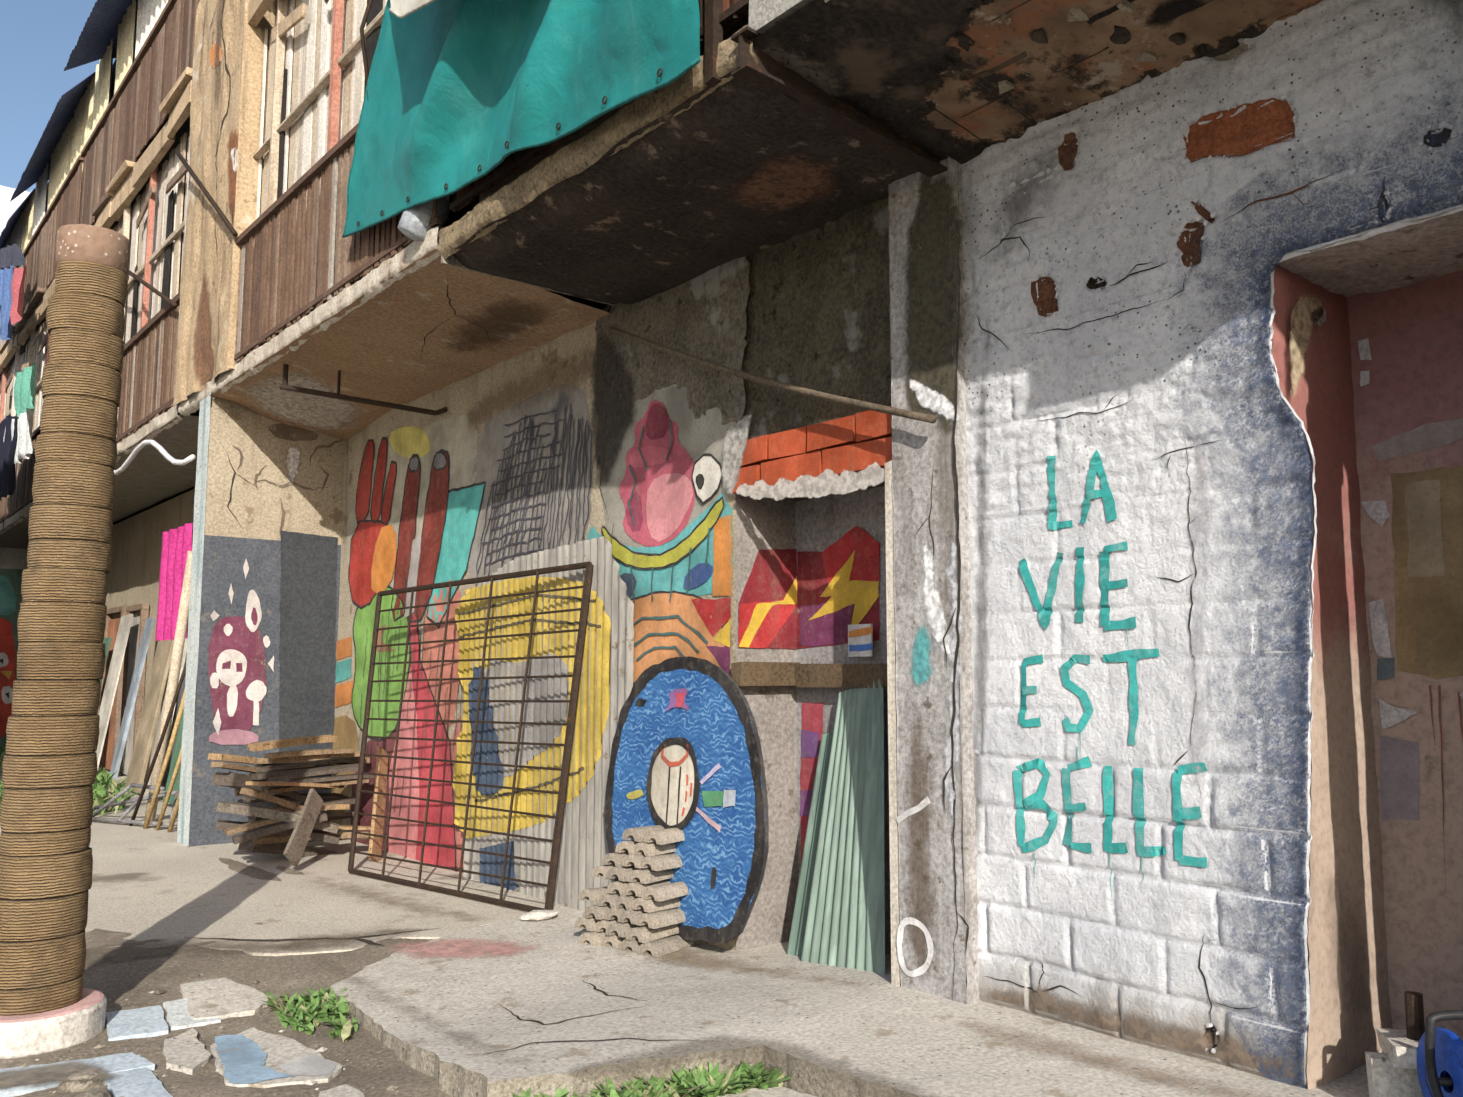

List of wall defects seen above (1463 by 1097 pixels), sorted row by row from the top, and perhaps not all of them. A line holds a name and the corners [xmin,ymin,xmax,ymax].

damp [1146,0,1204,27]
spalling [922,0,1324,143]
spalling [1055,132,1080,171]
spalling [1183,95,1298,163]
spalling [1175,199,1216,272]
damp [458,305,543,350]
spalling [1031,275,1059,317]
crack [222,445,251,529]
crack [916,172,1186,1001]
crack [1150,435,1220,794]
crack [1198,933,1256,1022]
crack [474,980,656,1056]